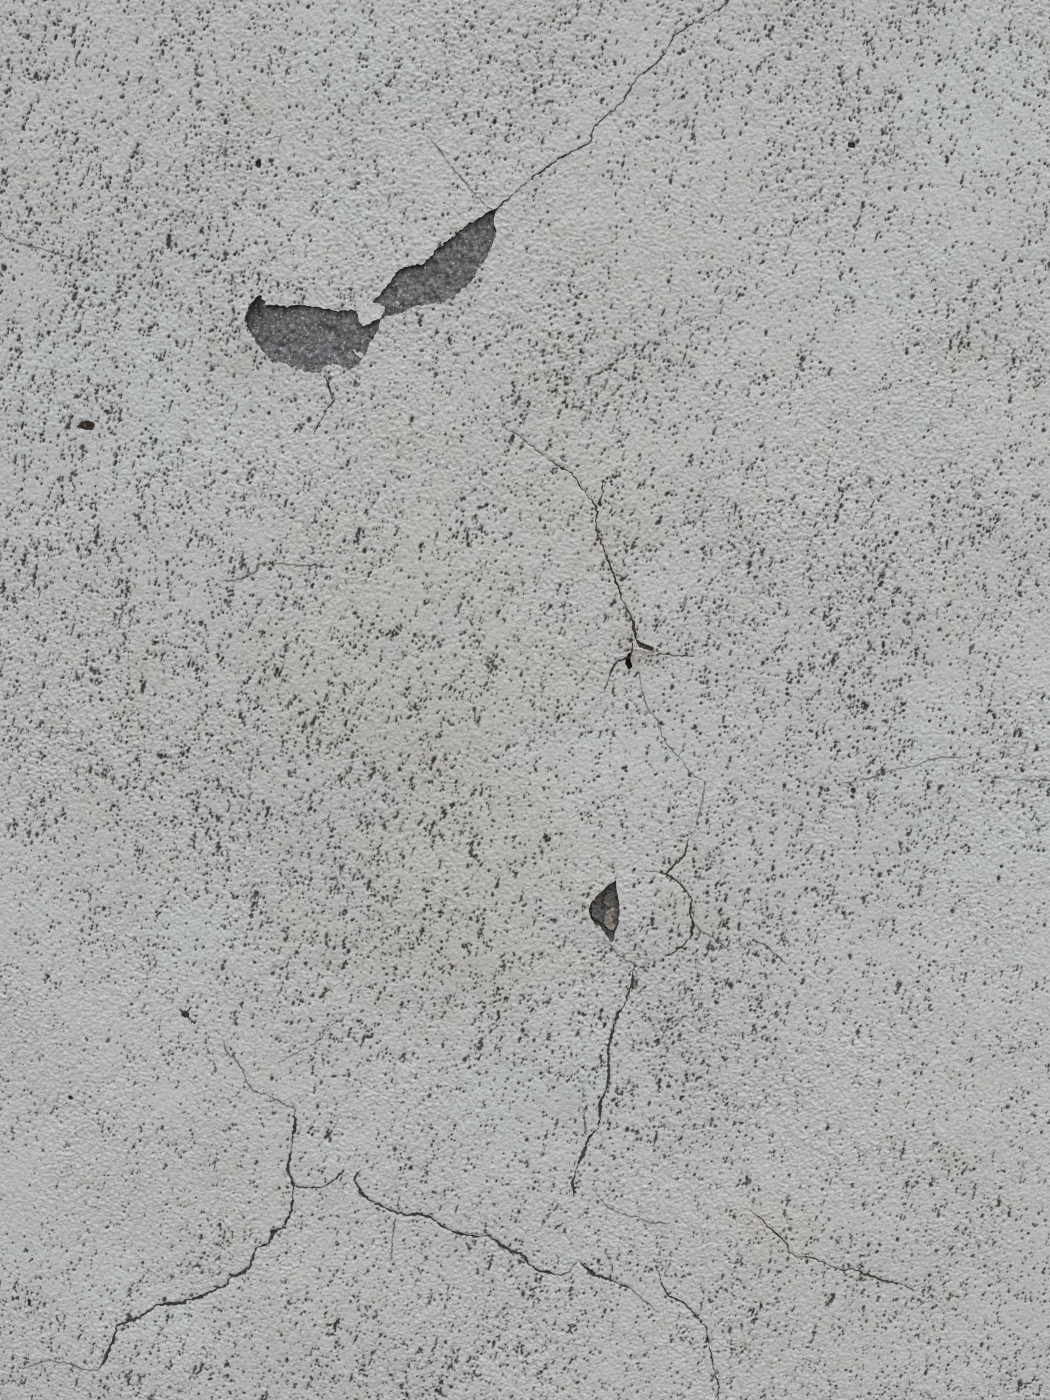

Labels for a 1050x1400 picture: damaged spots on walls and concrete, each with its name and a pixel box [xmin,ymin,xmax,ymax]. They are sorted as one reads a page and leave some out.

peeling [244,209,496,374]
spalling [589,880,620,942]
crack [21,1038,720,1399]